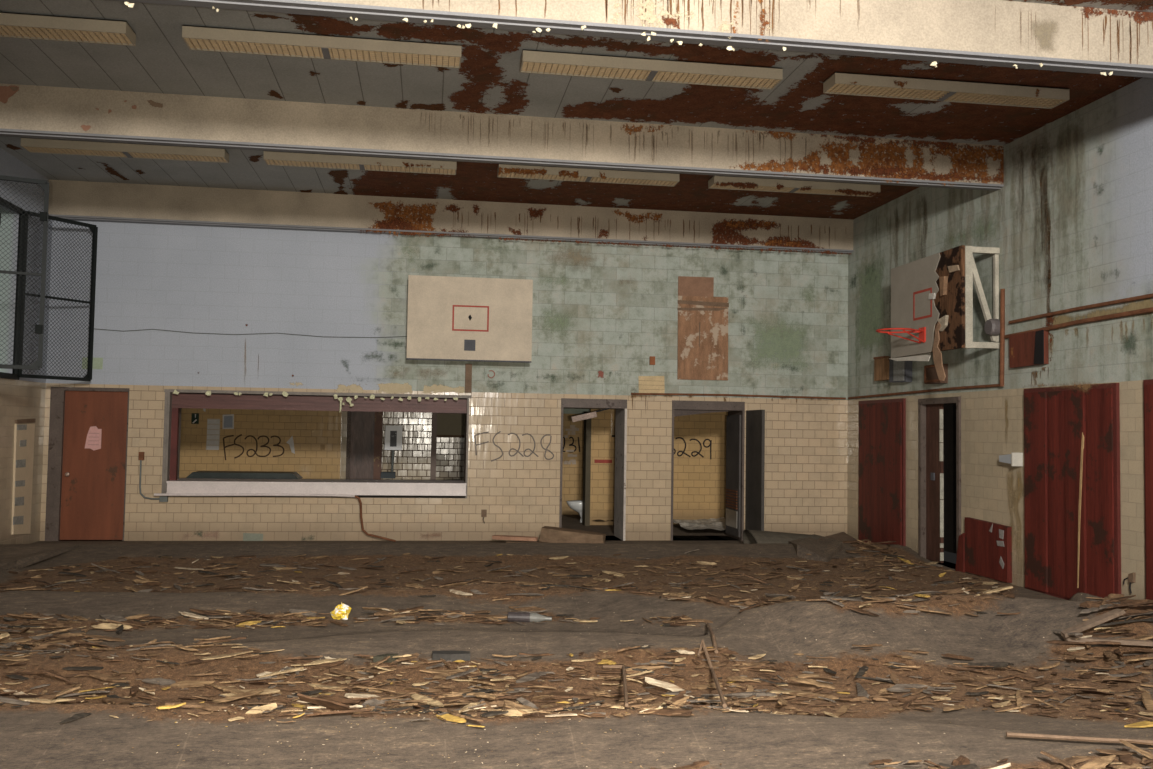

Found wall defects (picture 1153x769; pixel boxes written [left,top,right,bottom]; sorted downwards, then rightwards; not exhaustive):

corrosion [605,0,780,42]
corrosion [1031,15,1056,48]
peeling [1009,0,1153,11]
corrosion [1074,6,1153,64]
peeling [251,14,1143,144]
peeling [328,161,919,219]
corrosion [610,124,672,152]
corrosion [716,130,1004,197]
corrosion [360,199,851,255]